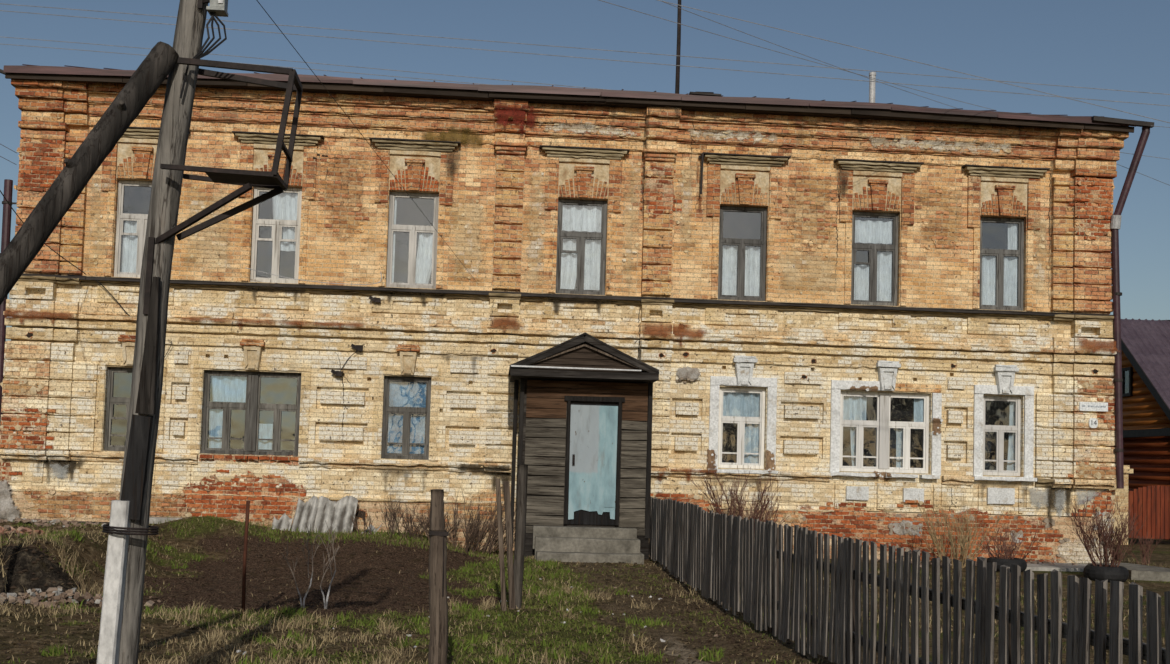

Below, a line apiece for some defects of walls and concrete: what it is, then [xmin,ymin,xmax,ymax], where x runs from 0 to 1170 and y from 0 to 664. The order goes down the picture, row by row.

spalling [14,135,70,194]
spalling [1069,177,1115,240]
spalling [0,378,56,484]
spalling [23,488,120,520]
spalling [150,454,307,522]
spalling [759,500,1092,563]